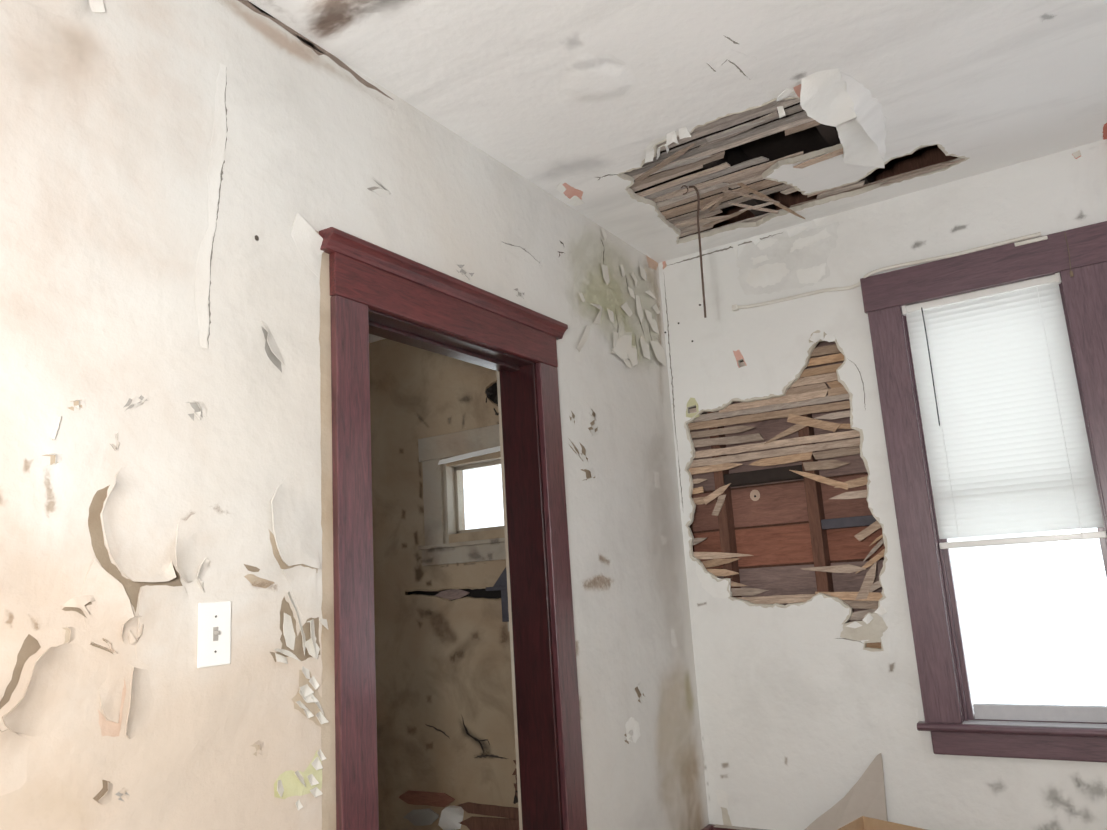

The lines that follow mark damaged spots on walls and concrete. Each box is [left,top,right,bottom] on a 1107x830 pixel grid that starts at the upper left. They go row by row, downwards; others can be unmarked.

crack [238,0,393,100]
peeling [577,228,667,369]
peeling [644,127,692,163]
flaking render [0,463,211,817]
flaking render [244,252,336,830]
spalling [684,330,888,652]